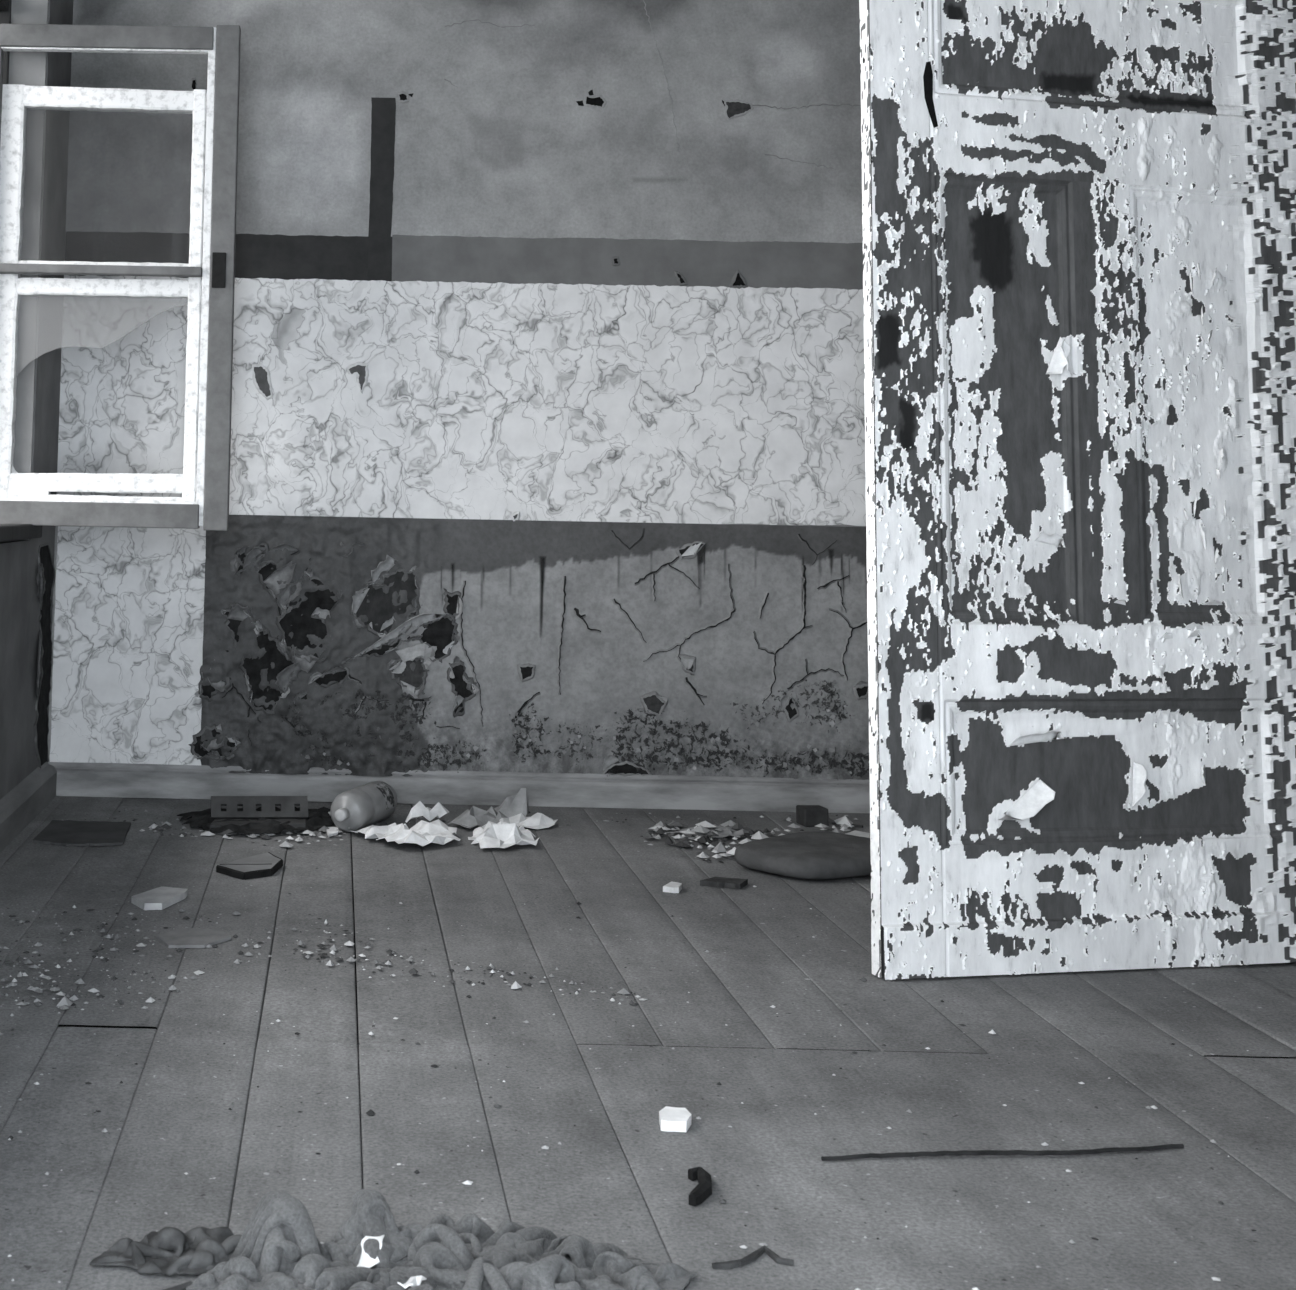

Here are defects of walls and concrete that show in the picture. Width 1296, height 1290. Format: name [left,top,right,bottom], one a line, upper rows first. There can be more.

peeling [1046,337,1076,375]
peeling [1194,492,1219,564]
leakage [697,544,705,571]
crack [515,528,867,719]
peeling [1160,623,1203,639]
peeling [188,542,489,771]
crack [348,581,483,730]
peeling [998,779,1055,820]
peeling [1132,762,1147,807]